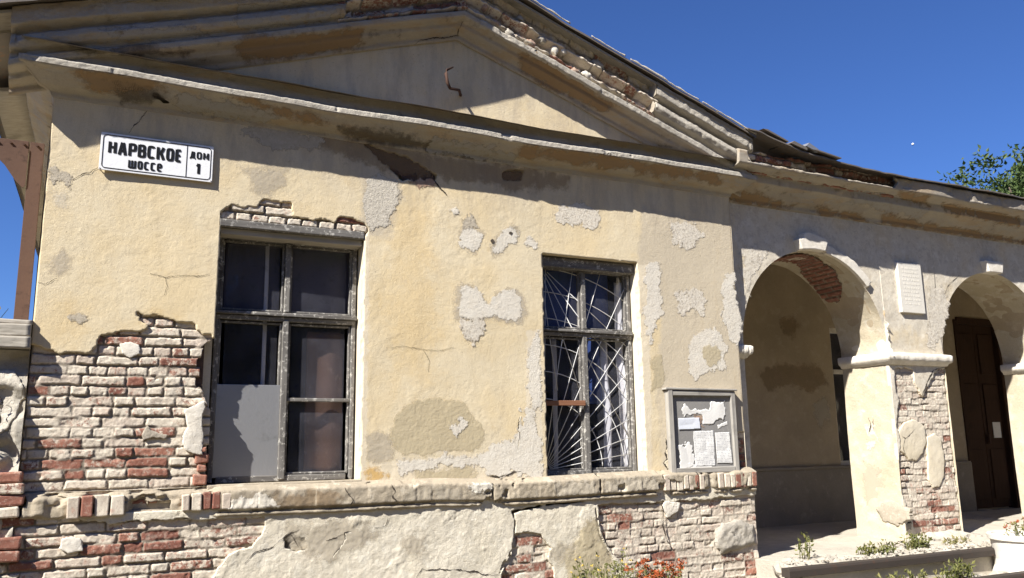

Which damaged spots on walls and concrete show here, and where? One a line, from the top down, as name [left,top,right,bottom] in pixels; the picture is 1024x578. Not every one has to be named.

peeling [554,200,601,230]
peeling [669,216,705,251]
peeling [453,284,527,347]
peeling [641,243,842,381]
flaking render [0,312,281,578]
water stain [389,397,484,456]
flaking render [876,323,961,536]
flaking render [553,432,759,578]
flaking render [499,525,554,578]